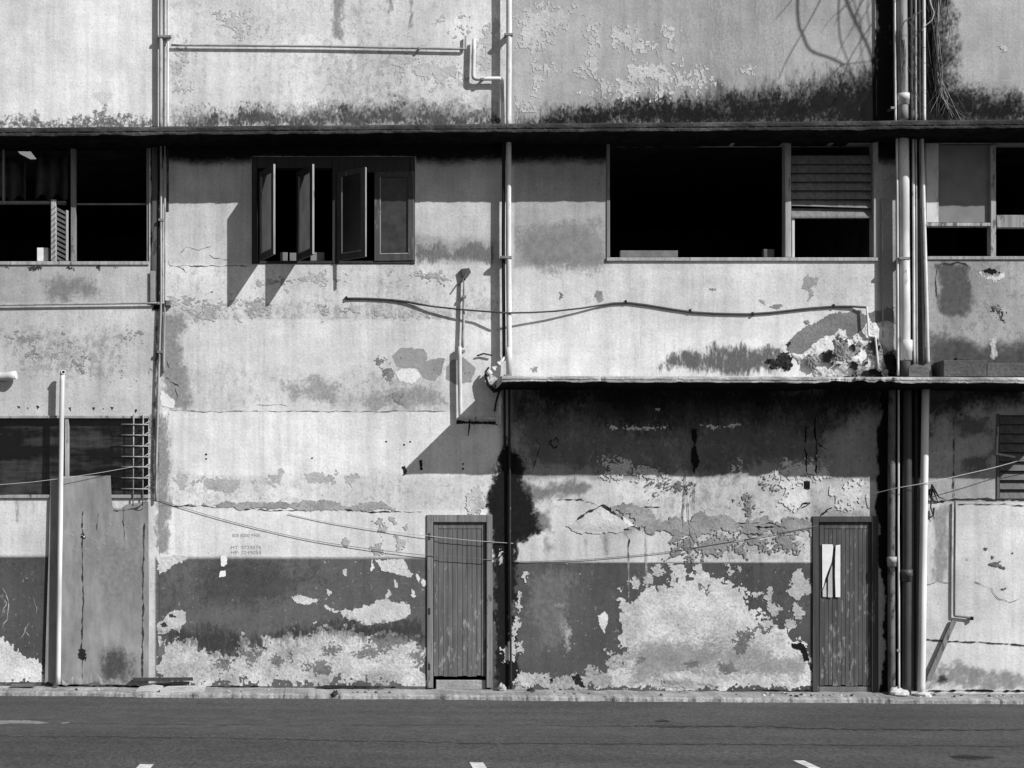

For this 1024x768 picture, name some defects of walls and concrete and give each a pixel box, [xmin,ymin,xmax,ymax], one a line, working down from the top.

peeling [513,0,717,112]
damp [520,0,1024,124]
mould [0,104,157,128]
mould [175,96,501,126]
spalling [375,357,404,405]
peeling [446,357,476,385]
damp [514,140,1024,692]
spalling [765,307,897,377]
peeling [829,478,868,512]
peeling [156,468,427,686]
peeling [499,475,812,691]
peeling [0,636,44,682]